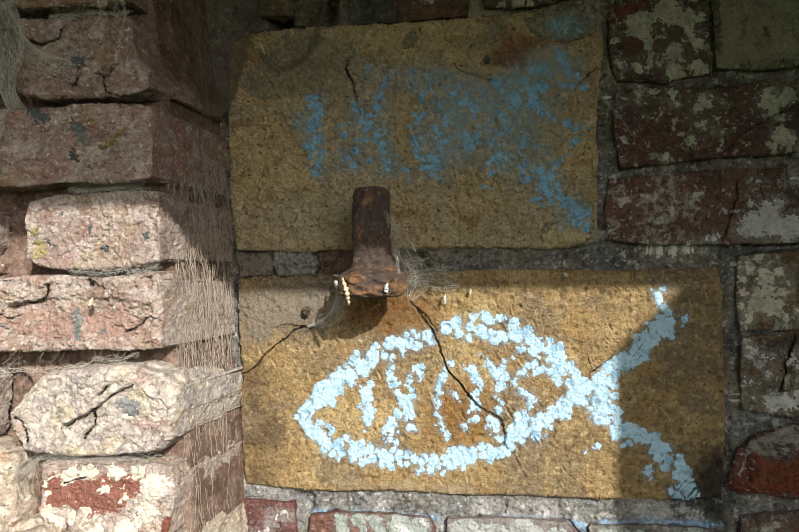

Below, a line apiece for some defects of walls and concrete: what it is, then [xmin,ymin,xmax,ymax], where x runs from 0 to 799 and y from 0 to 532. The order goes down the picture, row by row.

crack [0,285,50,319]
crack [60,386,129,439]
crack [243,318,327,374]
crack [412,304,524,472]
crack [780,336,796,393]
peeling [40,461,176,532]